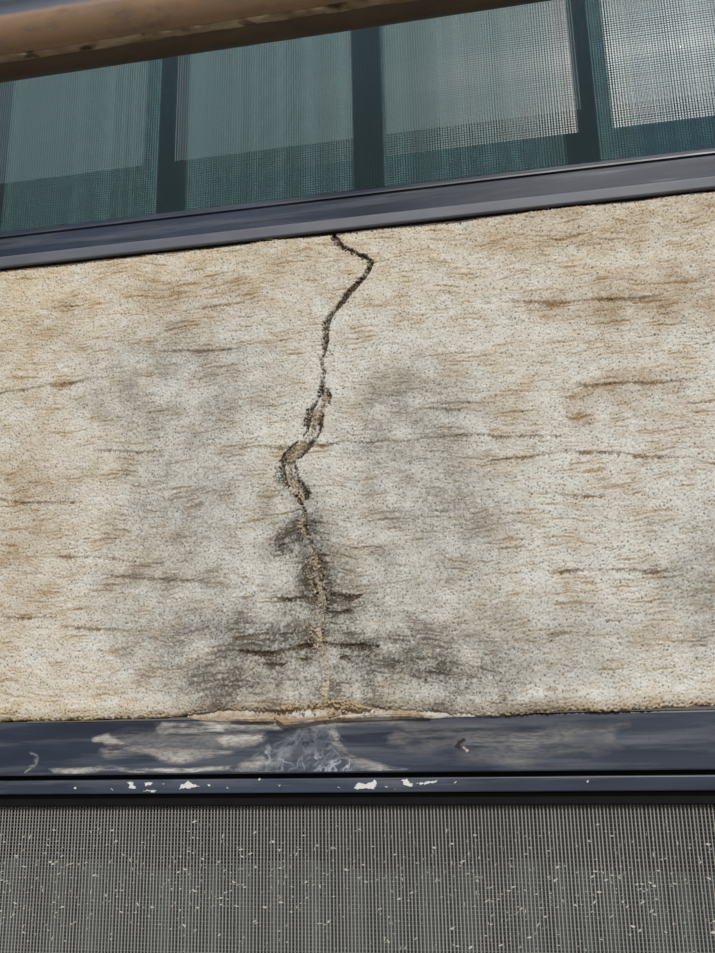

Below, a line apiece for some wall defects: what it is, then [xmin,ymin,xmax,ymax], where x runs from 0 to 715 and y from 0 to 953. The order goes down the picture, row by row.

crack [235,235,380,668]
water stain [129,511,498,711]
water stain [157,722,337,763]